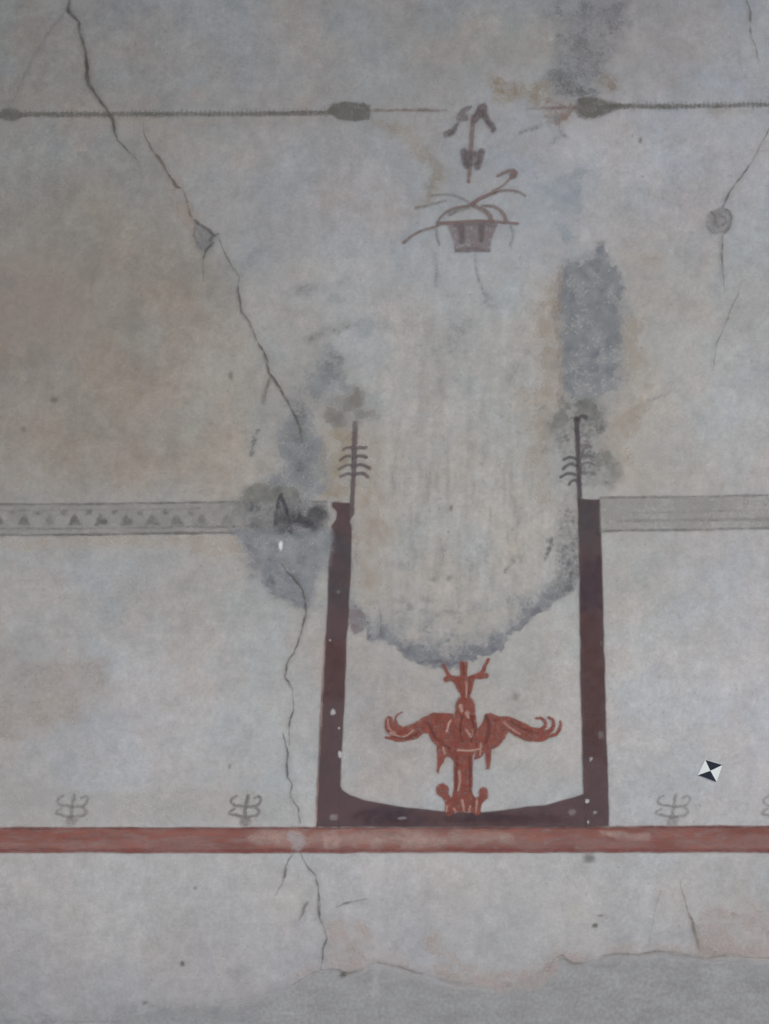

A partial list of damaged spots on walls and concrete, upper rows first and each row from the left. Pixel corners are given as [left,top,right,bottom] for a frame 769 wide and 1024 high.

crack [66,1,191,216]
crack [237,287,301,433]
leakage [527,245,647,484]
leakage [169,398,598,670]
crack [285,573,307,684]
crack [283,709,299,812]
crack [283,857,350,959]